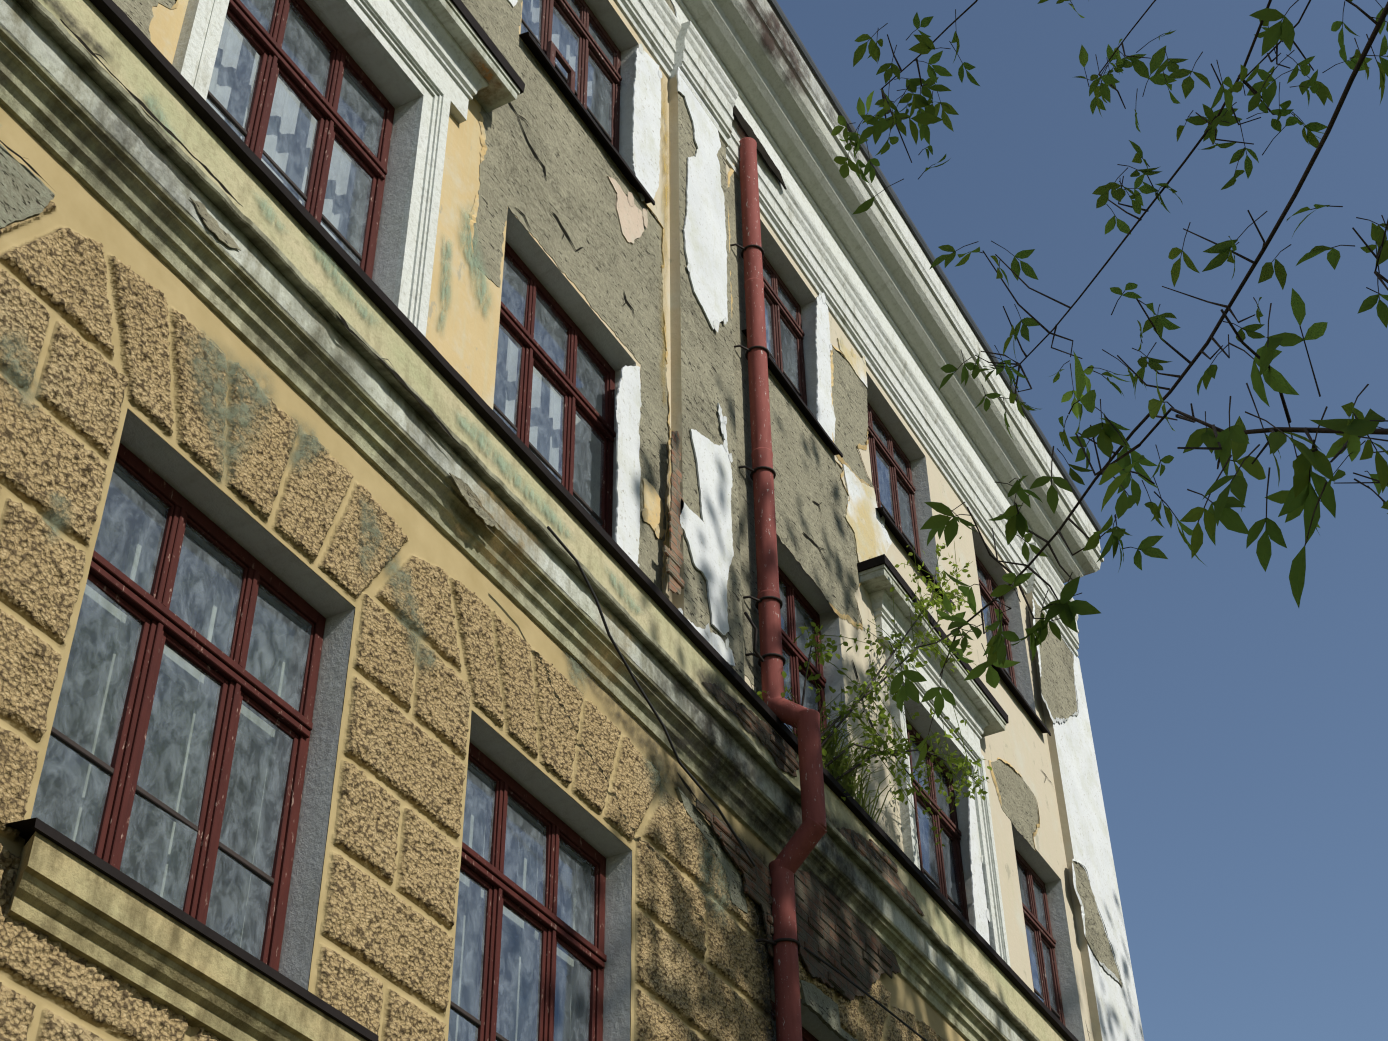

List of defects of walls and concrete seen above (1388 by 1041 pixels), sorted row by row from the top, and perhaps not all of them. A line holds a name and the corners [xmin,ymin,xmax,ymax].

water stain [48,0,108,55]
peeling [112,0,179,41]
water stain [316,250,372,323]
peeling [461,0,762,692]
peeling [449,473,500,530]
peeling [768,293,892,630]
peeling [1032,596,1079,724]
spalling [702,682,799,777]
spalling [696,798,774,958]
spalling [838,827,924,916]
spalling [794,870,901,1001]